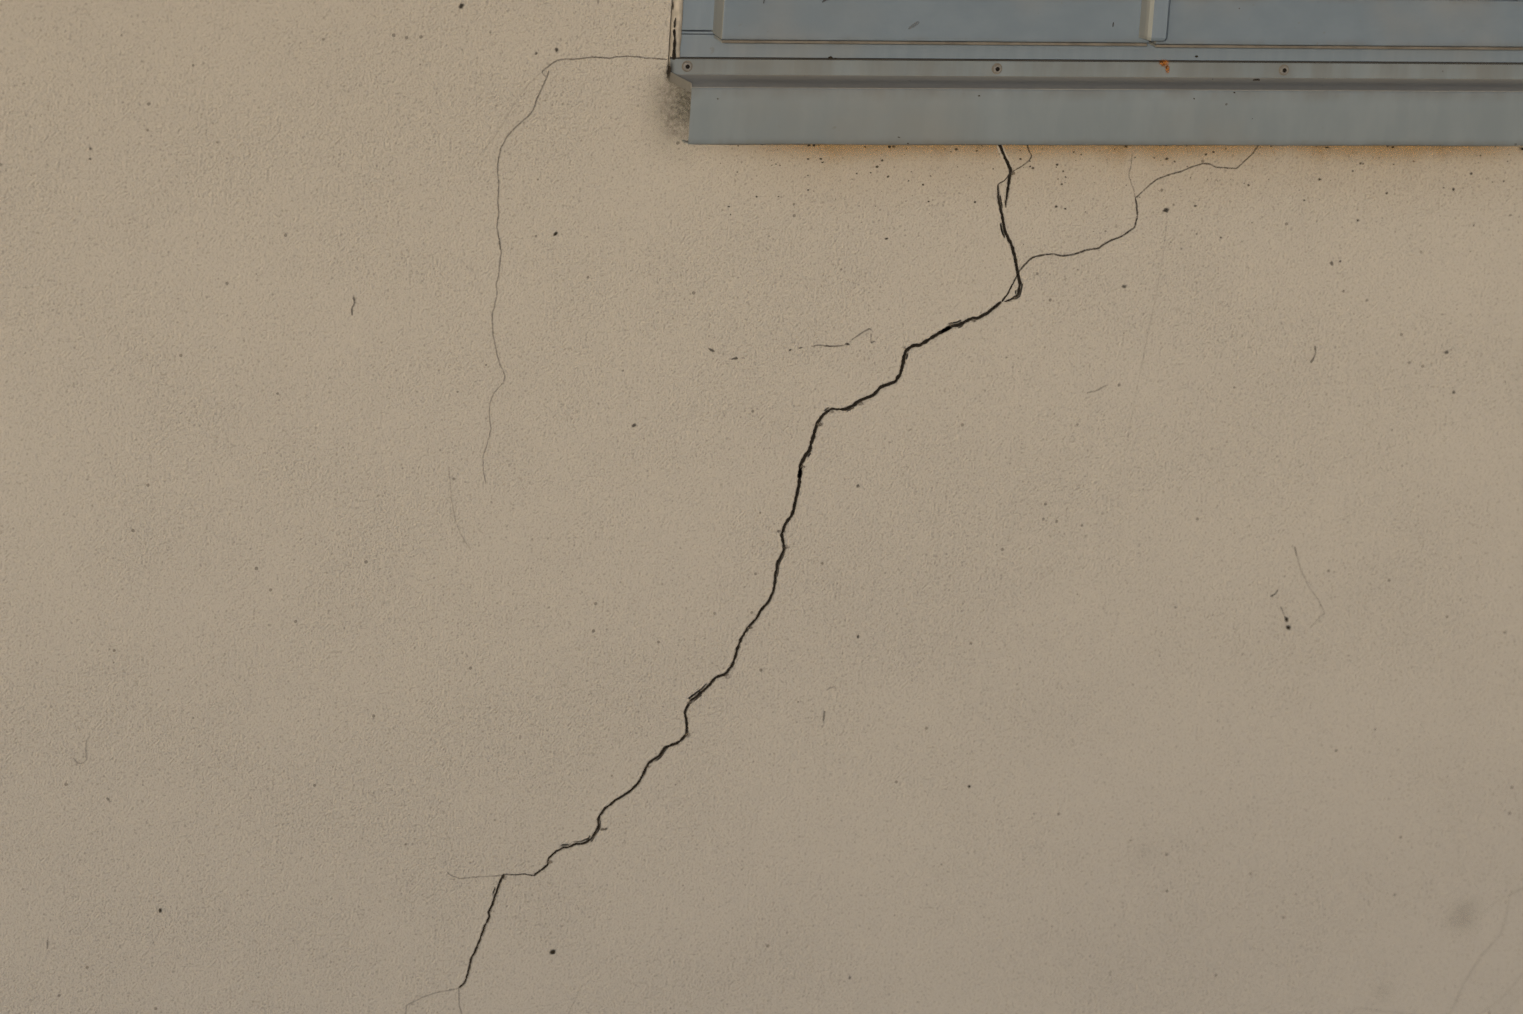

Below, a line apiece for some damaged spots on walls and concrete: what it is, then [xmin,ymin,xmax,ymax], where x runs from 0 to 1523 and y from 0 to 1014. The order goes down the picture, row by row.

crack [457,145,1259,990]